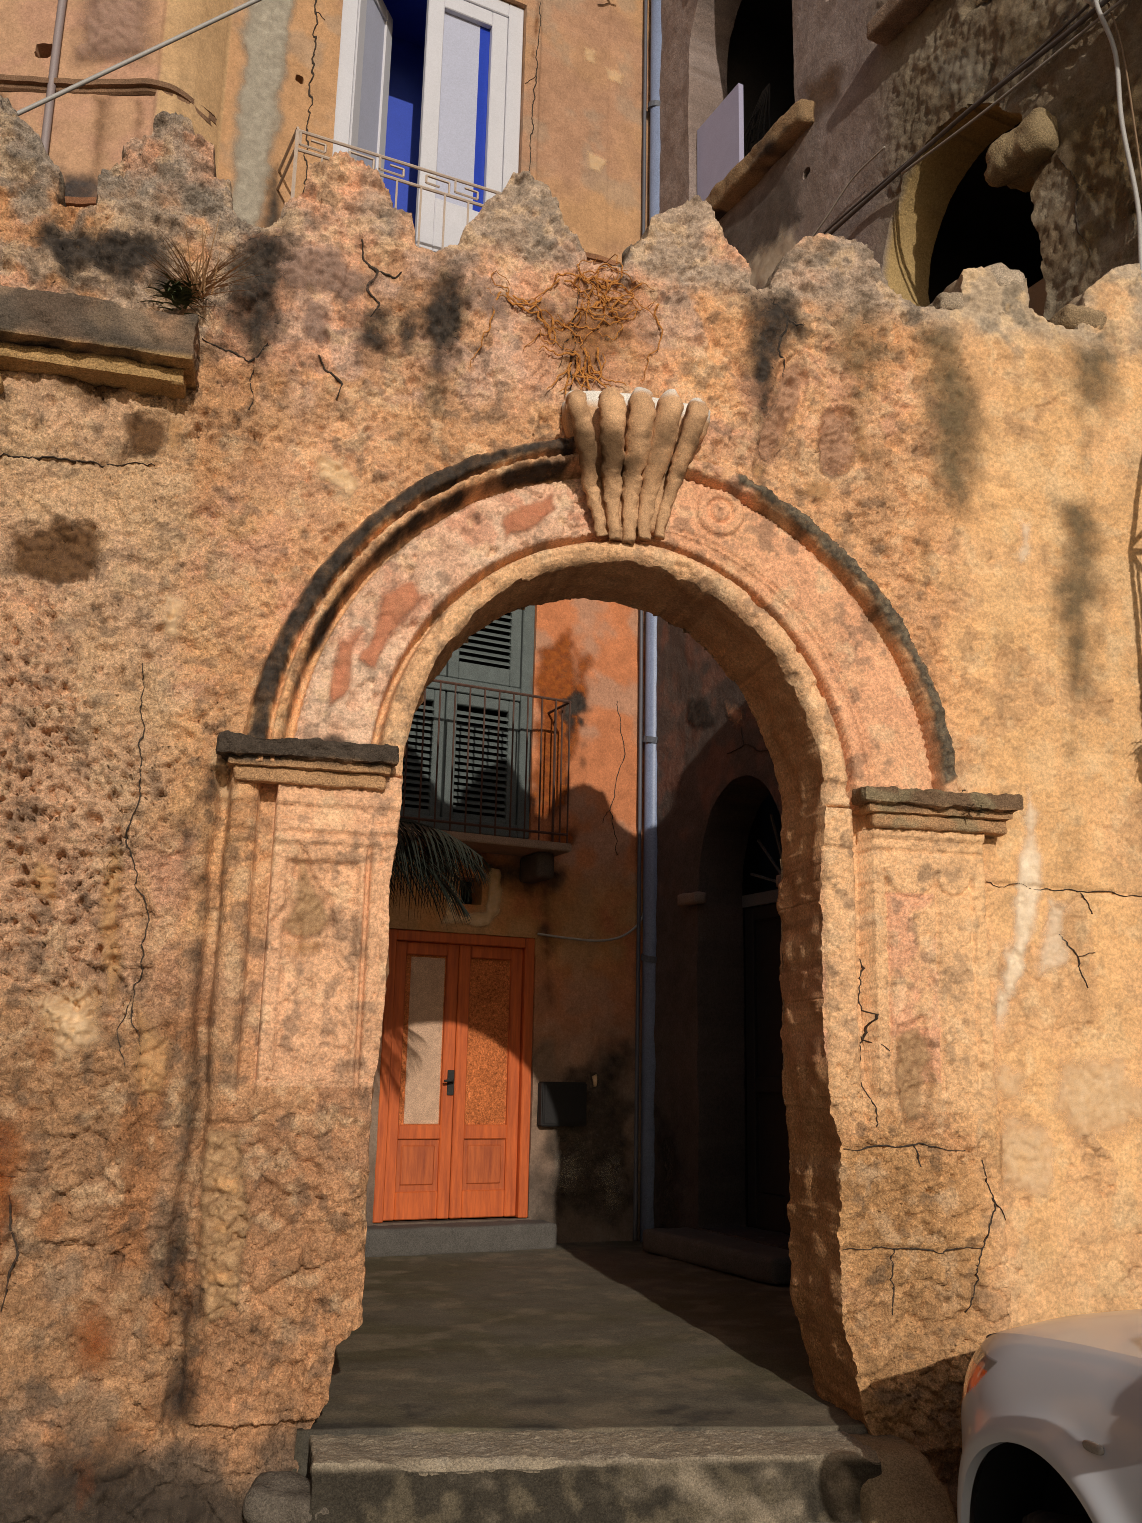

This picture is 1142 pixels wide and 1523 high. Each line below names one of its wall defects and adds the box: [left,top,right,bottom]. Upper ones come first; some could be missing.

crack [302,0,325,194]
crack [361,239,402,316]
leakage [1060,504,1097,671]
crack [104,663,152,1099]
efflorescence [997,804,1065,1020]
crack [986,881,1142,914]
crack [1059,934,1095,988]
crack [843,959,1006,1315]
leakage [0,1460,246,1523]